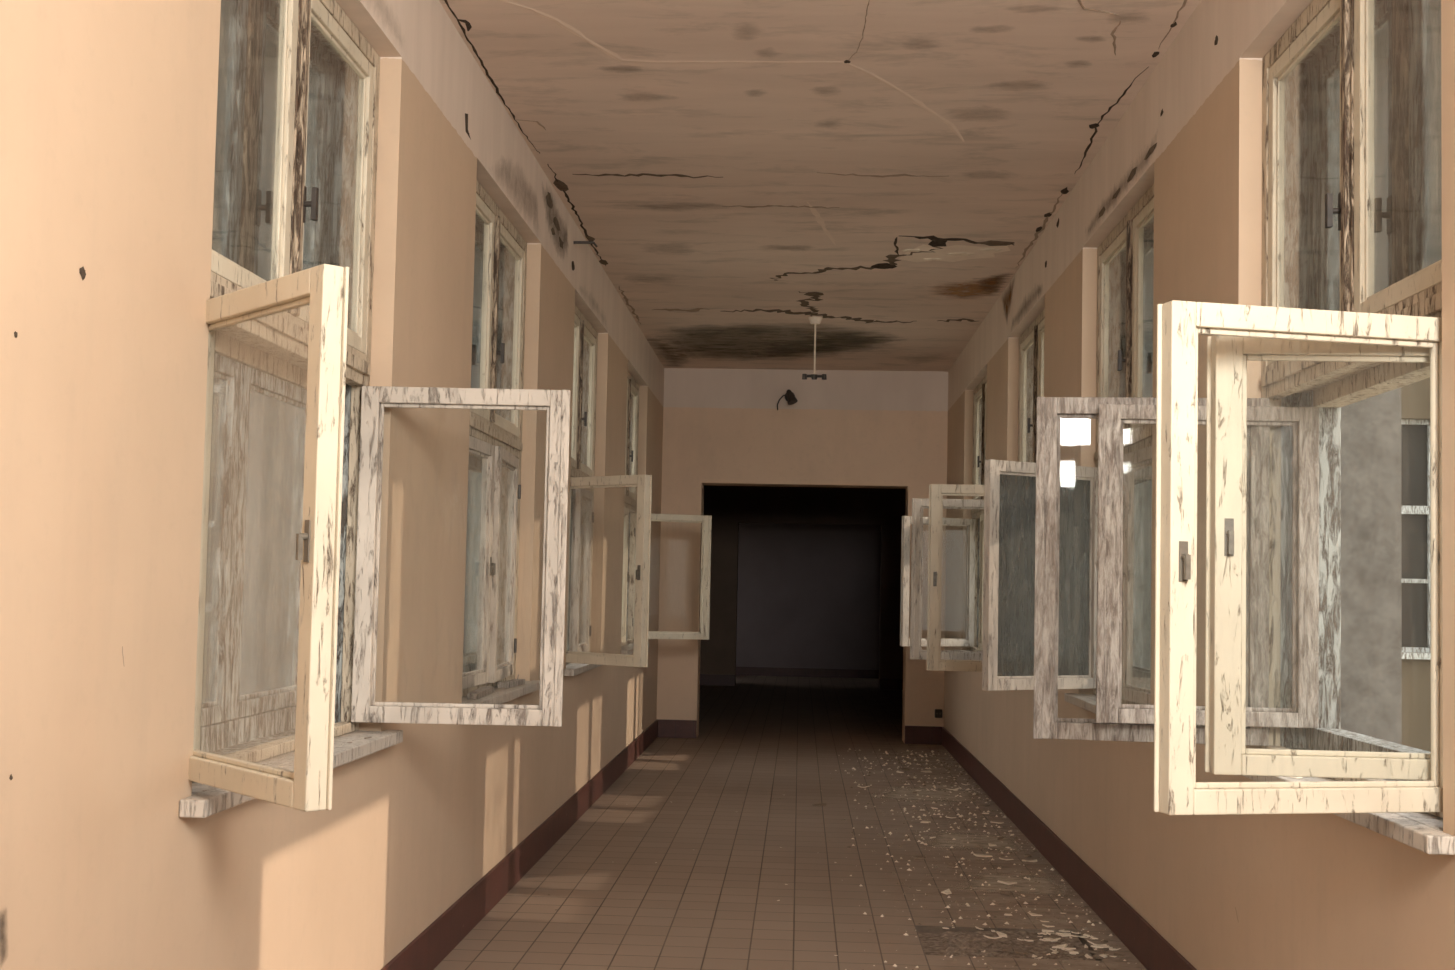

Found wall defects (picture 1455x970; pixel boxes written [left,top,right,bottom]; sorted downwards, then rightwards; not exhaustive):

crack [444,0,1187,324]
leakage [660,326,879,366]